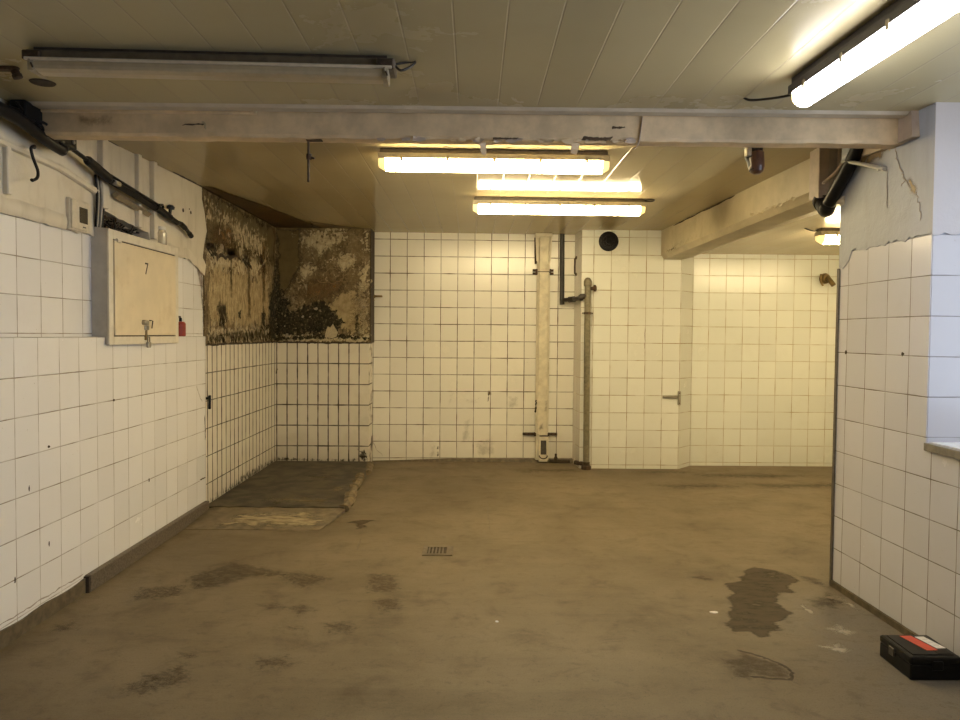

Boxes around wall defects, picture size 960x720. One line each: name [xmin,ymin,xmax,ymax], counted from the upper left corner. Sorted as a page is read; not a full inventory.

leakage [173,172,354,228]
crack [886,148,921,220]
peeling [204,193,373,346]
leakage [209,242,369,344]
leakage [724,567,813,637]